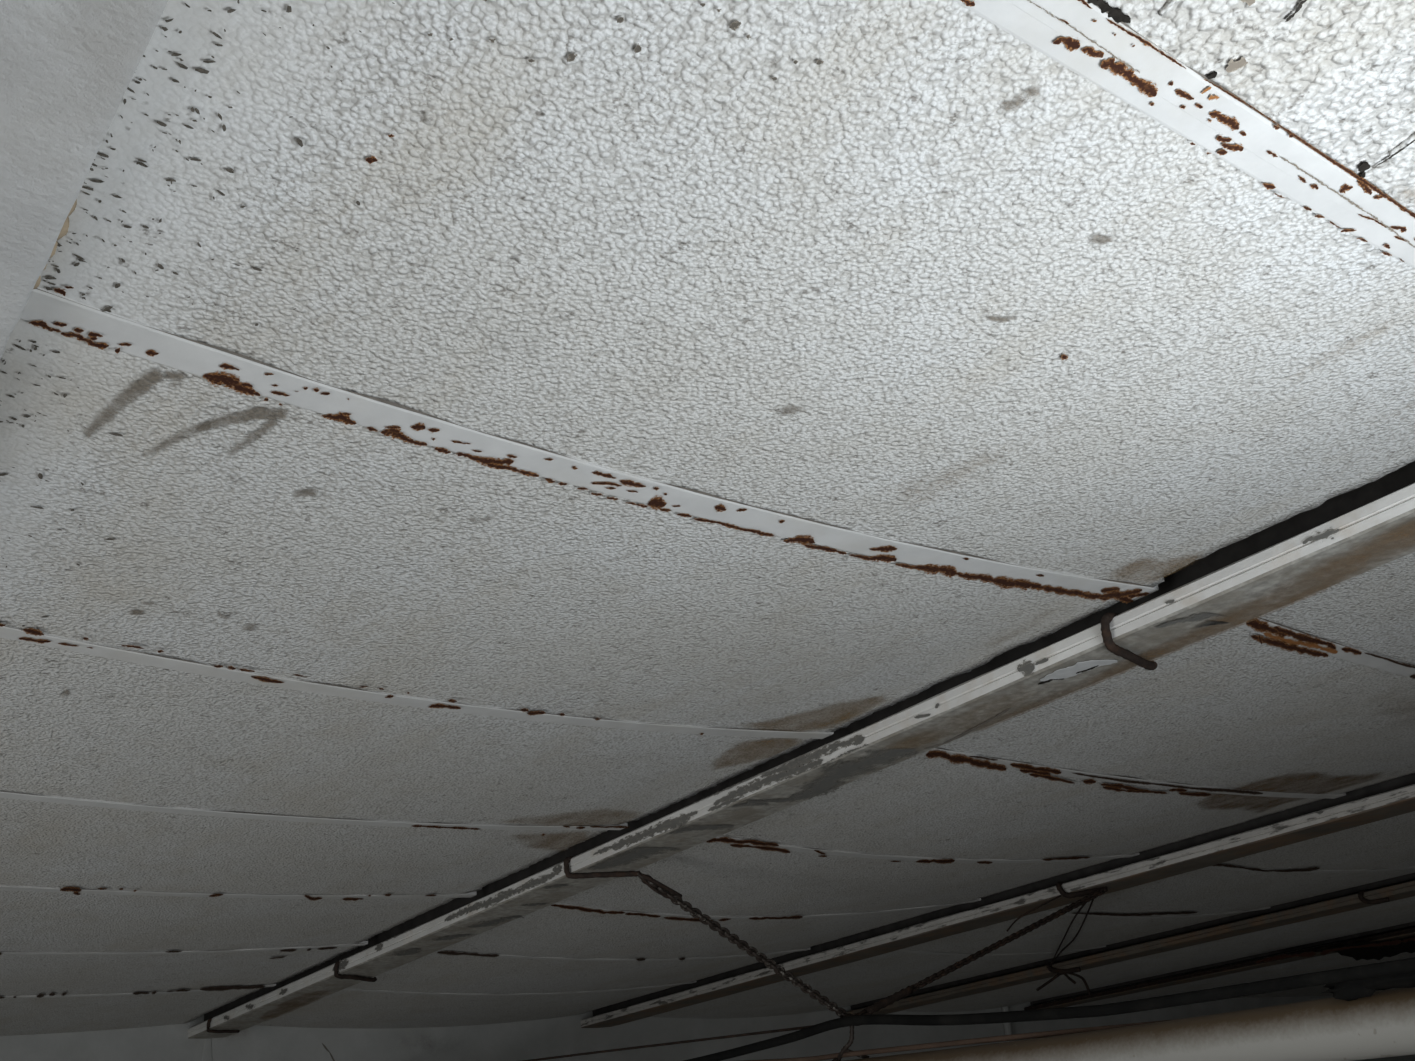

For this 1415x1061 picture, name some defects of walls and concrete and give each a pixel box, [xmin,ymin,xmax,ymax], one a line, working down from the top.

crack [1285,0,1307,22]
crack [1028,0,1140,73]
corrosion [1053,0,1415,263]
crack [1375,140,1415,167]
crack [1281,157,1415,248]
corrosion [29,320,159,357]
corrosion [203,363,330,406]
corrosion [321,398,1149,604]
corrosion [19,628,93,649]
corrosion [1246,618,1415,679]
corrosion [214,665,307,683]
corrosion [926,749,1263,797]